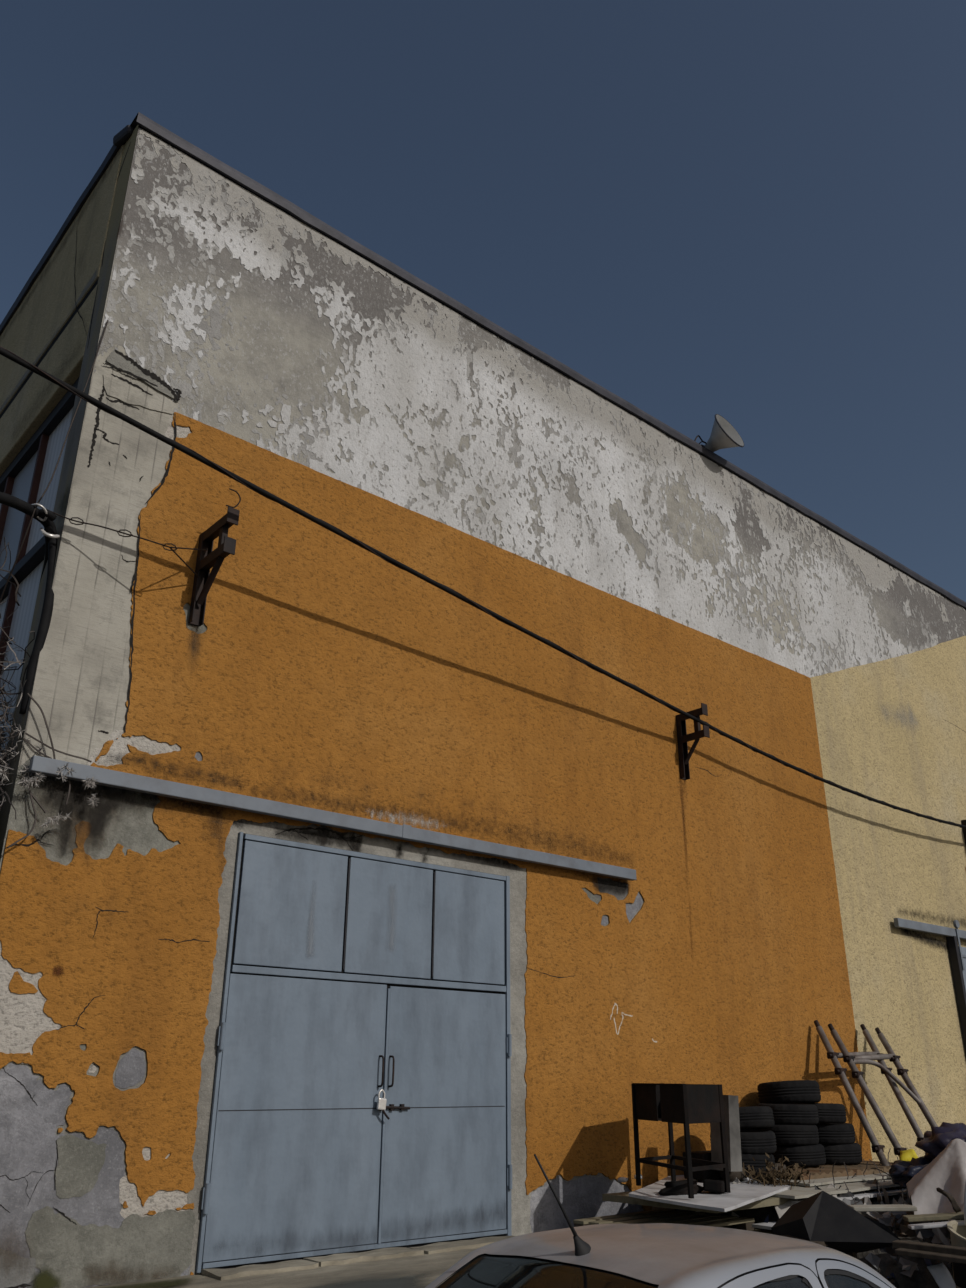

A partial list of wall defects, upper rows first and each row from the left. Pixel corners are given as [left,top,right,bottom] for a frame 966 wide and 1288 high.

peeling [91,128,966,676]
crack [74,231,182,734]
spalling [87,730,202,767]
spalling [6,759,180,866]
spalling [582,877,643,925]
spalling [0,941,196,1288]
crack [0,1140,77,1225]